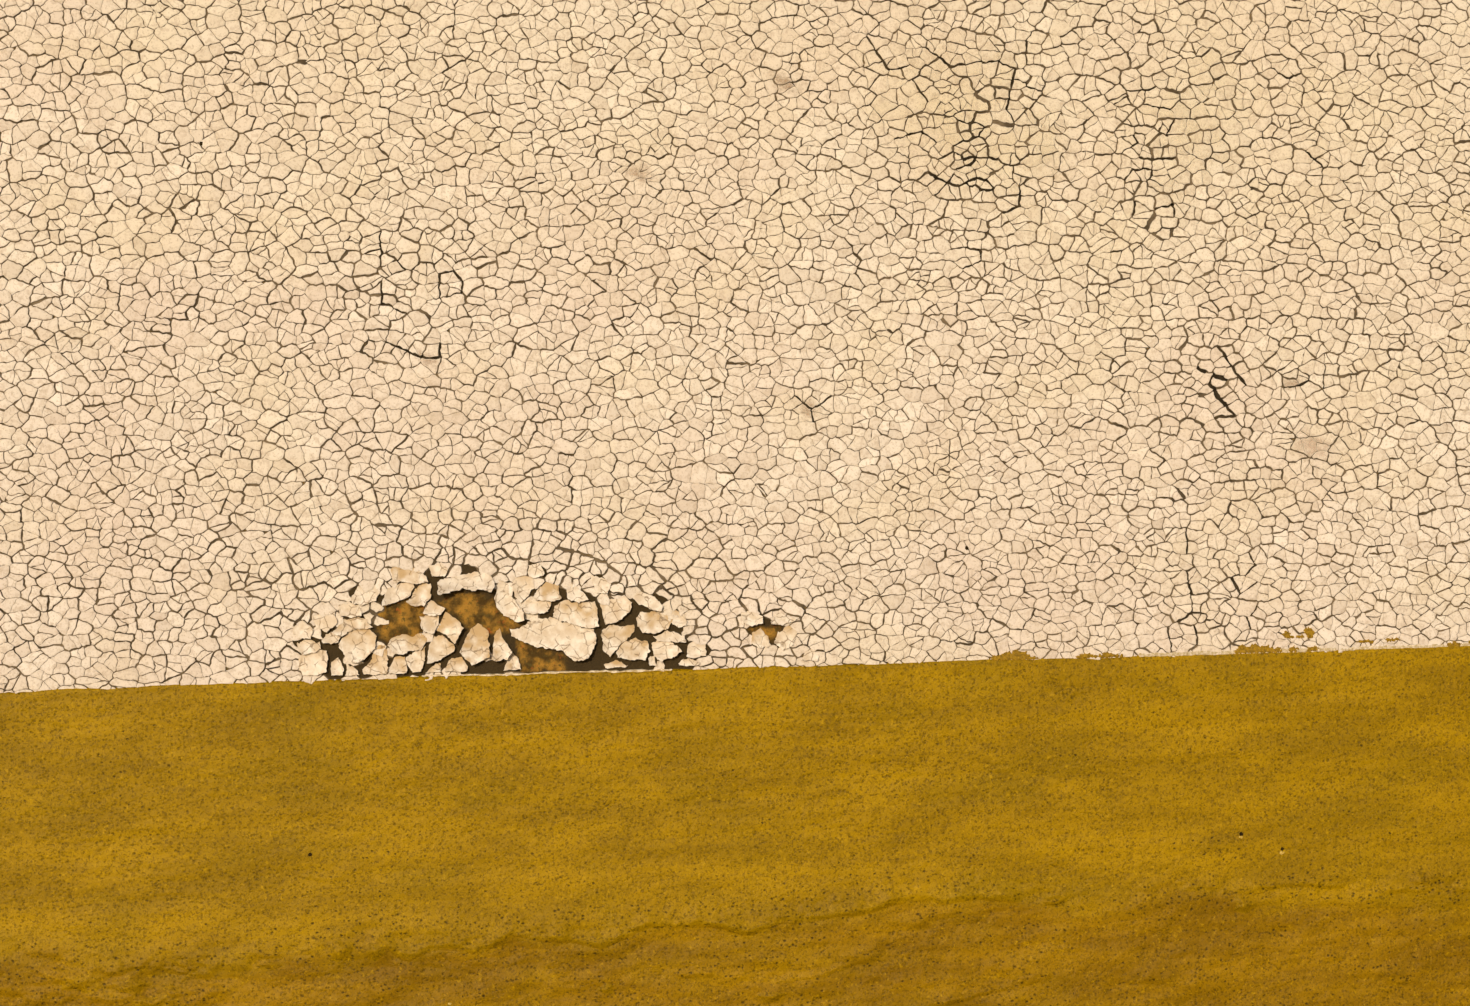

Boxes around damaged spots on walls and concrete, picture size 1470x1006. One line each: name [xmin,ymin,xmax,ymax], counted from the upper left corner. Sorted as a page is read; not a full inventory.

crack [0,0,1470,692]
peeling [286,560,713,679]
peeling [736,609,819,661]